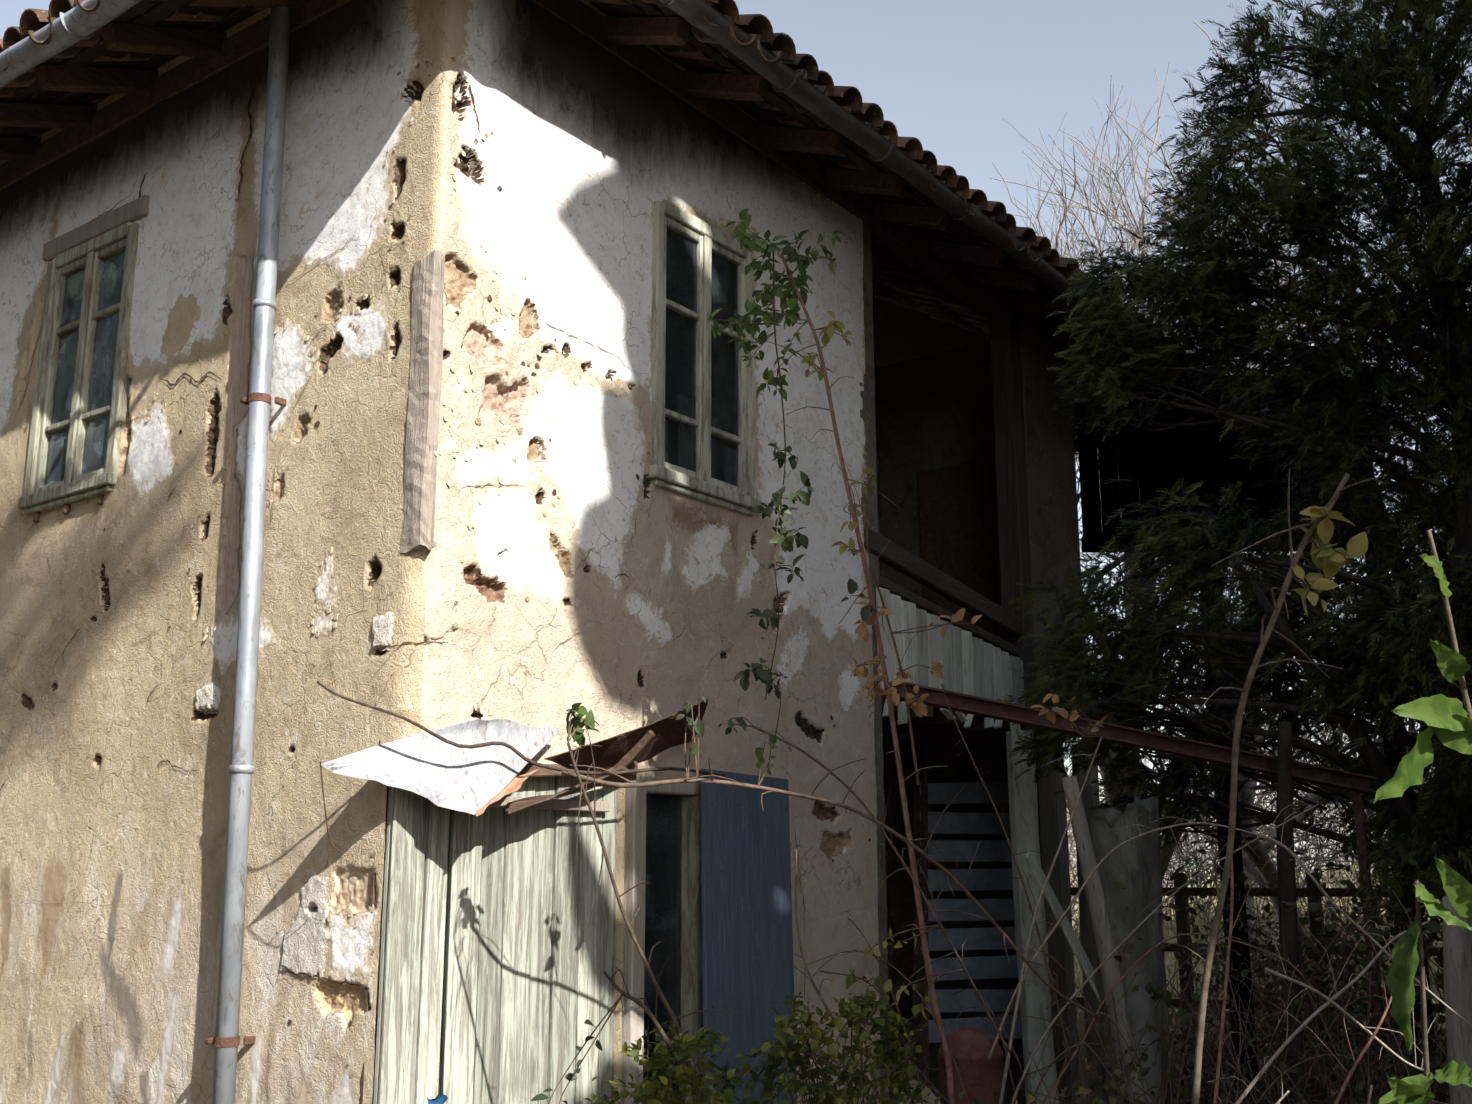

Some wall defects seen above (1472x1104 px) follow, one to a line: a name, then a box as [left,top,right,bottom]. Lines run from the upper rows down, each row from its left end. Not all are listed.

peeling [269,0,431,444]
peeling [0,90,267,497]
crack [161,368,222,393]
peeling [434,0,867,763]
flaking render [90,528,117,622]
flaking render [199,511,210,542]
peeling [188,567,239,720]
peeling [311,547,339,637]
flaking render [367,557,382,586]
flaking render [372,612,395,656]
crack [376,594,448,688]
crack [282,965,366,992]